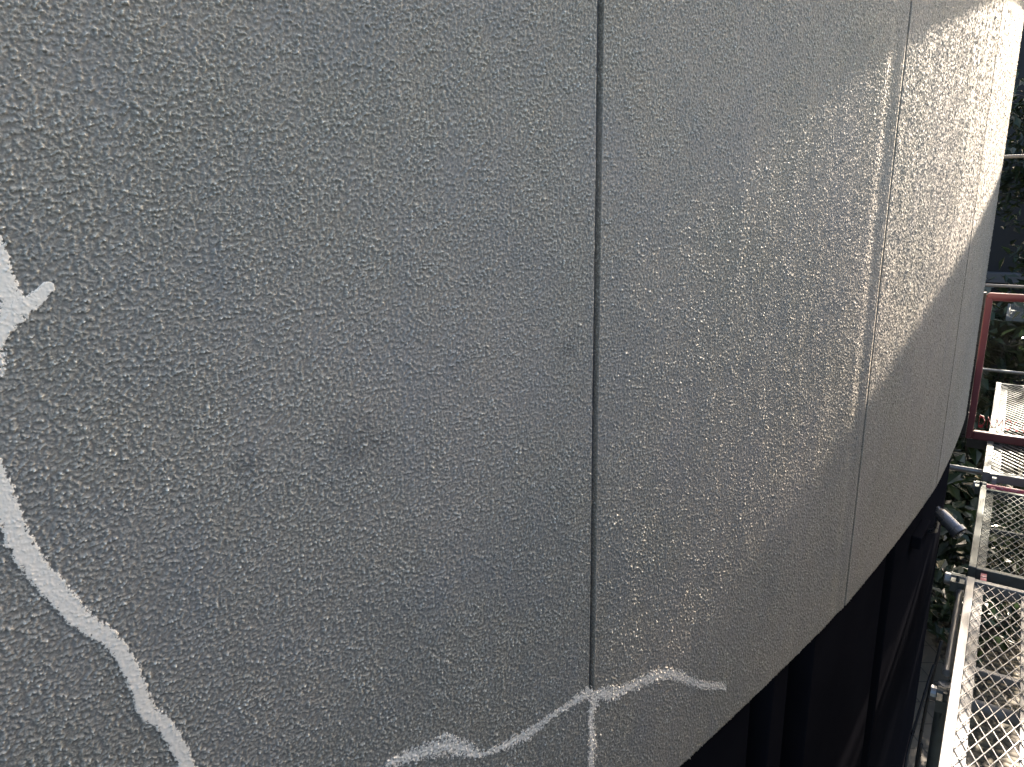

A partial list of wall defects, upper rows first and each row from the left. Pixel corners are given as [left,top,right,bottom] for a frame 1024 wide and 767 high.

crack [0,235,55,377]
crack [0,458,198,767]
crack [386,666,727,767]